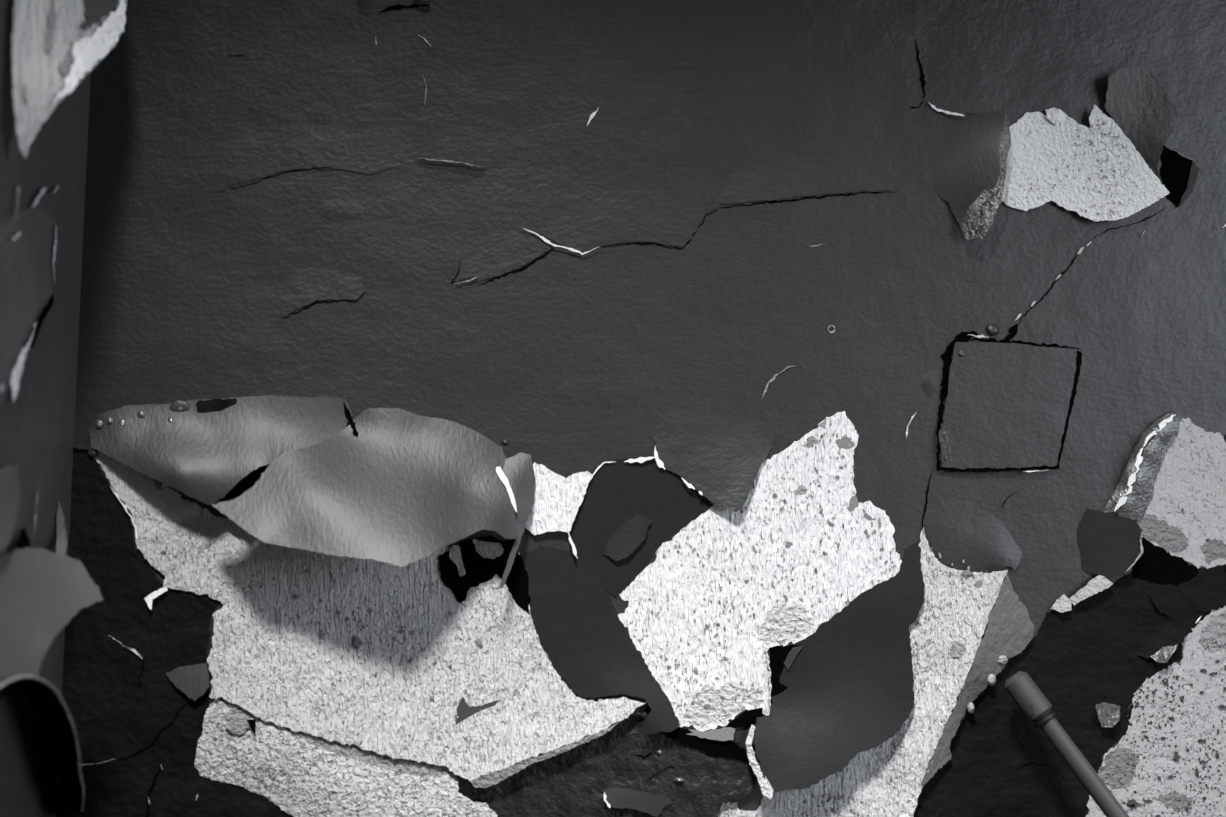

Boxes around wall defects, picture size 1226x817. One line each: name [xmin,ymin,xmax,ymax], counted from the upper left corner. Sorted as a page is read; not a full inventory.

peeling [11,0,127,160]
crack [211,168,331,194]
crack [451,249,553,284]
crack [602,191,895,250]
spalling [1002,104,1193,221]
crack [922,208,1165,536]
spalling [1132,417,1226,586]
spalling [93,452,651,817]
spalling [618,411,902,762]
spalling [718,527,1035,817]
spalling [1101,606,1226,817]
spalling [1085,795,1106,817]